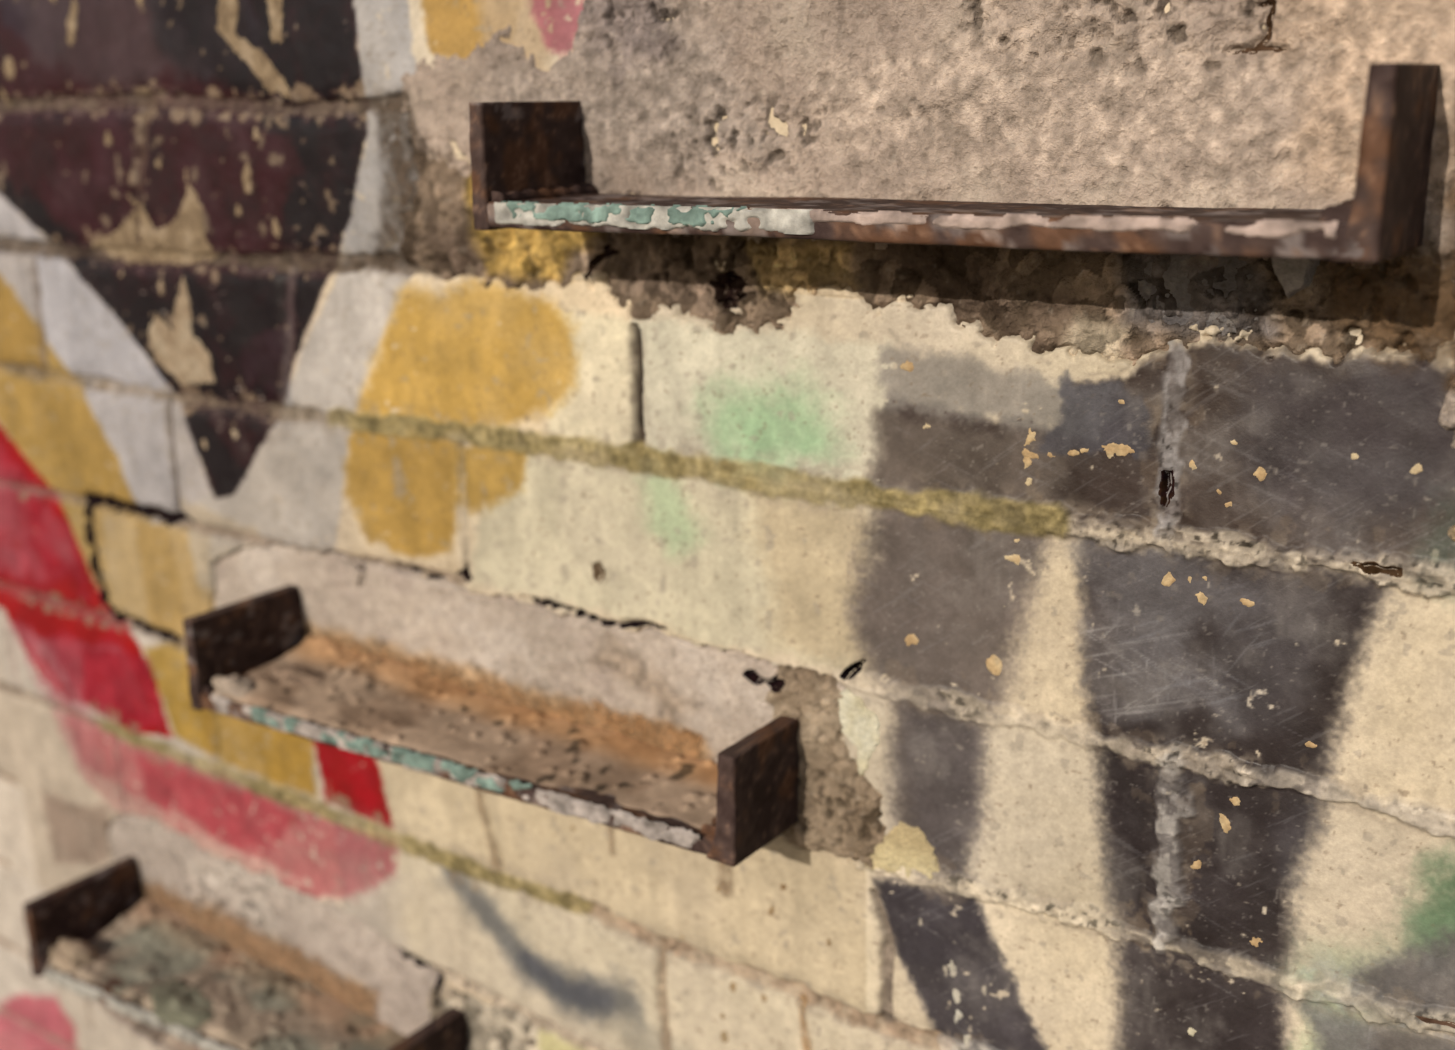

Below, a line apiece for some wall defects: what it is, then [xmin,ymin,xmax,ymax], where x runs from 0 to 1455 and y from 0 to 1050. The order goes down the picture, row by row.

spalling [400,0,1455,366]
peeling [1022,428,1135,486]
corrosion [334,640,701,759]
peeling [838,688,880,776]
peeling [947,960,970,1047]